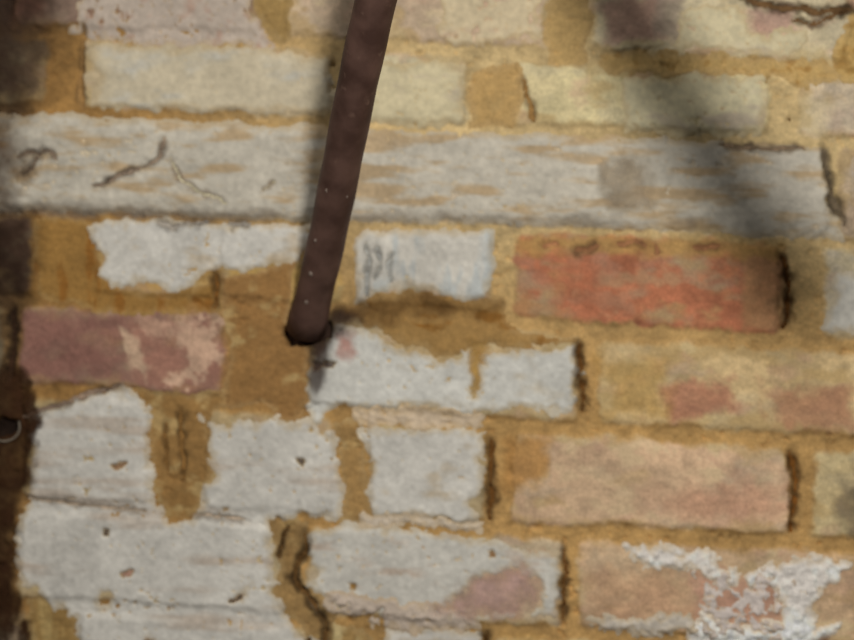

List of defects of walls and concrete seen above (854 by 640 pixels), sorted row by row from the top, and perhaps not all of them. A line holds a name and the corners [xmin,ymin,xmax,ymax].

leakage [0,0,48,103]
peeling [68,0,336,115]
crack [746,0,854,27]
crack [17,149,57,175]
crack [92,137,251,231]
peeling [350,0,854,243]
leakage [0,223,26,297]
peeling [0,111,586,640]
leakage [0,368,41,640]
crack [277,526,328,640]
leakage [585,540,853,640]